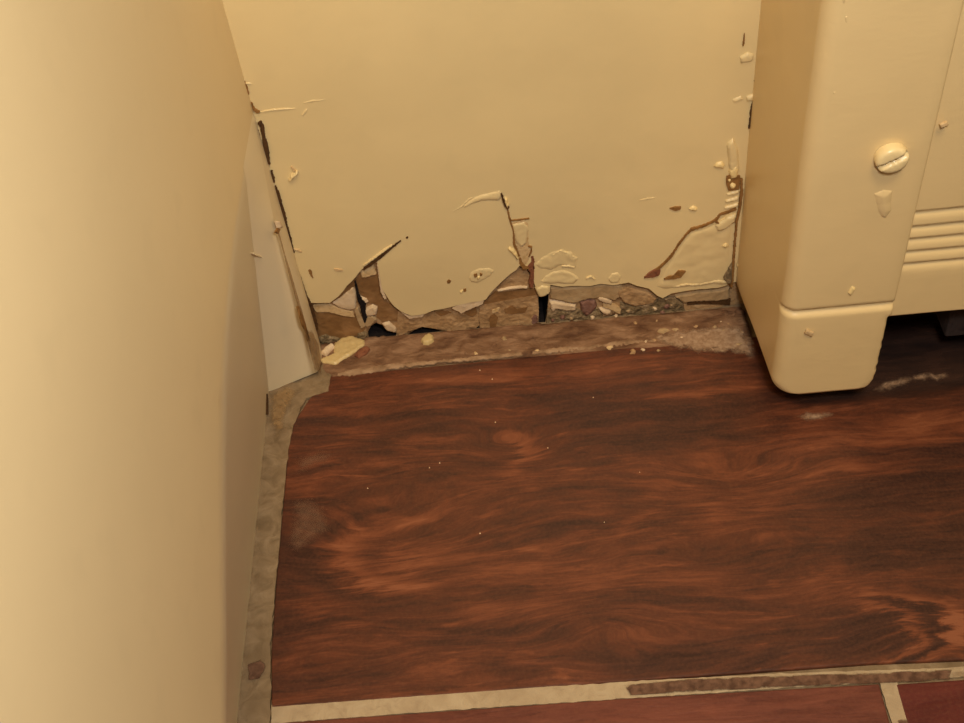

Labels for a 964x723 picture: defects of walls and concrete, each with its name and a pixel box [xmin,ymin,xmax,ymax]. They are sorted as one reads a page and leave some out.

peeling [453,190,509,212]
peeling [715,213,736,231]
spalling [274,221,731,372]